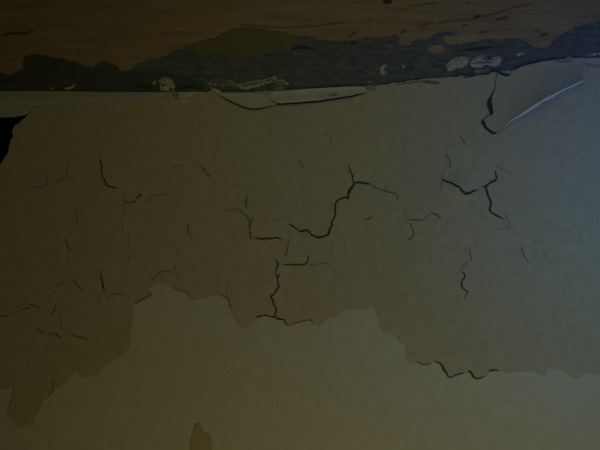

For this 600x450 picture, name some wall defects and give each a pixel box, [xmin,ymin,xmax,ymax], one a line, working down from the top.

spalling [0,114,28,164]
crack [99,159,168,216]
crack [440,154,511,230]
crack [222,165,441,326]
crack [100,266,193,304]
crack [461,249,472,298]
crack [417,361,498,379]